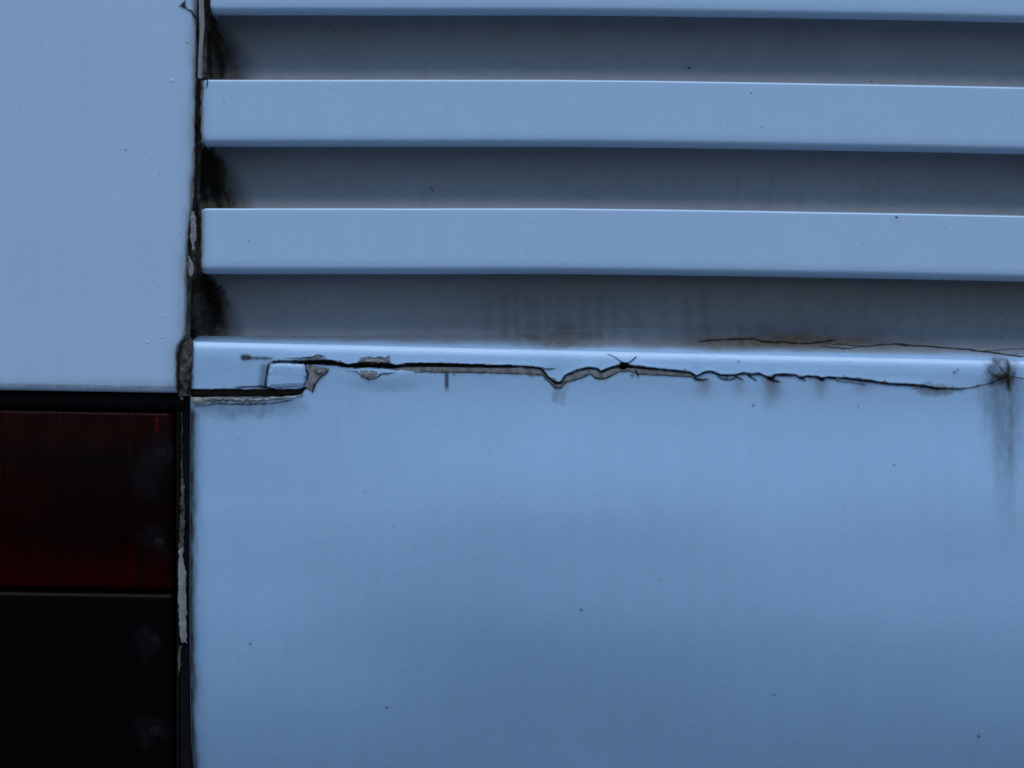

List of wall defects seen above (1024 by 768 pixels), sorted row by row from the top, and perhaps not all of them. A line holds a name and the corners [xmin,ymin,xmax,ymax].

water stain [189,0,229,221]
spalling [268,354,329,393]
peeling [345,355,396,380]
crack [176,337,1024,407]
peeling [178,413,187,672]